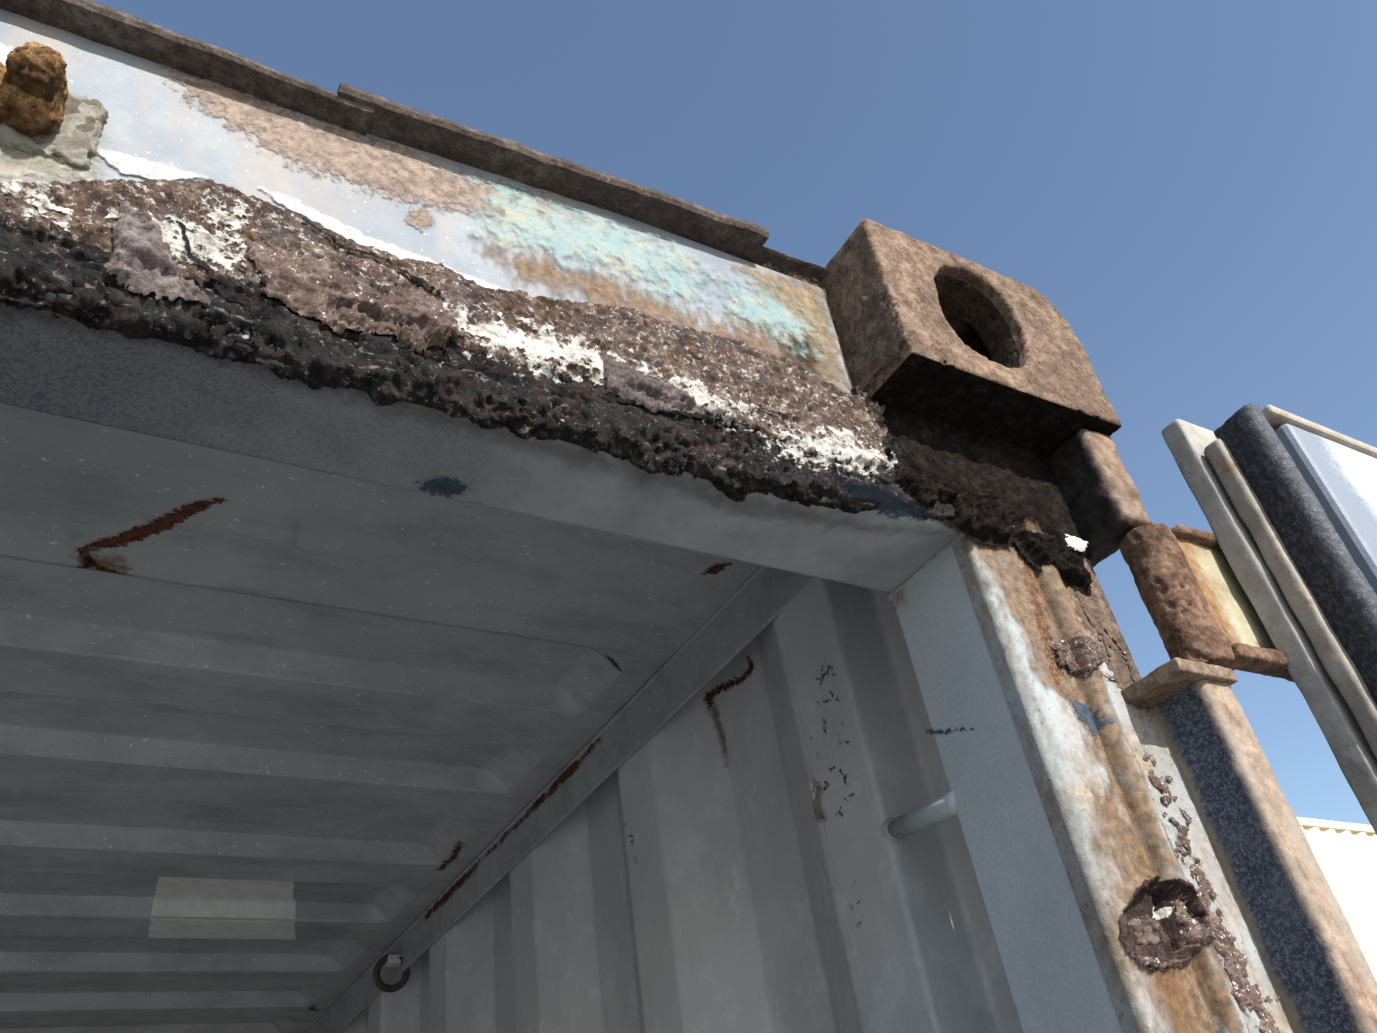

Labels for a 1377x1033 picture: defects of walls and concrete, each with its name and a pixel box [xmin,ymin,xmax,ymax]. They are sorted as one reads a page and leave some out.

rust [103,199,212,305]
peeling [106,190,262,276]
rust [247,242,468,354]
rust [405,206,435,232]
peeling [163,65,824,358]
rust [485,245,855,393]
rust [598,350,705,415]
rust [74,497,225,577]
rust [703,656,755,754]
rust [980,524,1281,1033]